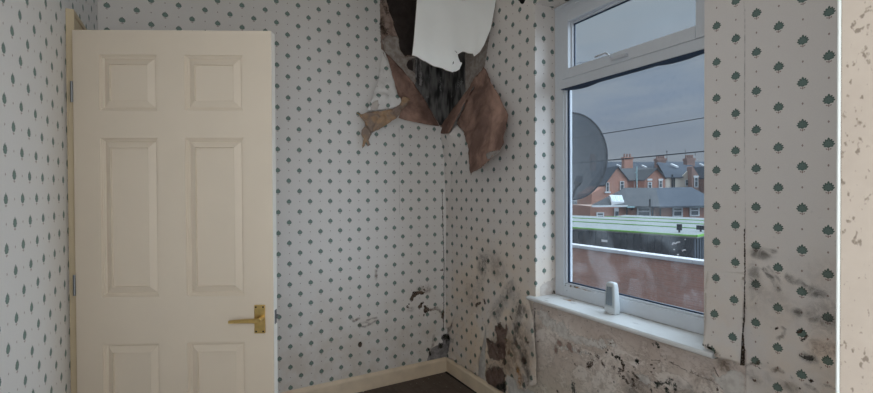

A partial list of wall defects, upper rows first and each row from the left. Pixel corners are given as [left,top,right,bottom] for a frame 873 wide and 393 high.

spalling [379,0,419,91]
flaking render [463,2,496,95]
water stain [406,286,441,316]
water stain [555,340,640,389]
flaking render [506,302,746,393]
water stain [650,364,677,393]